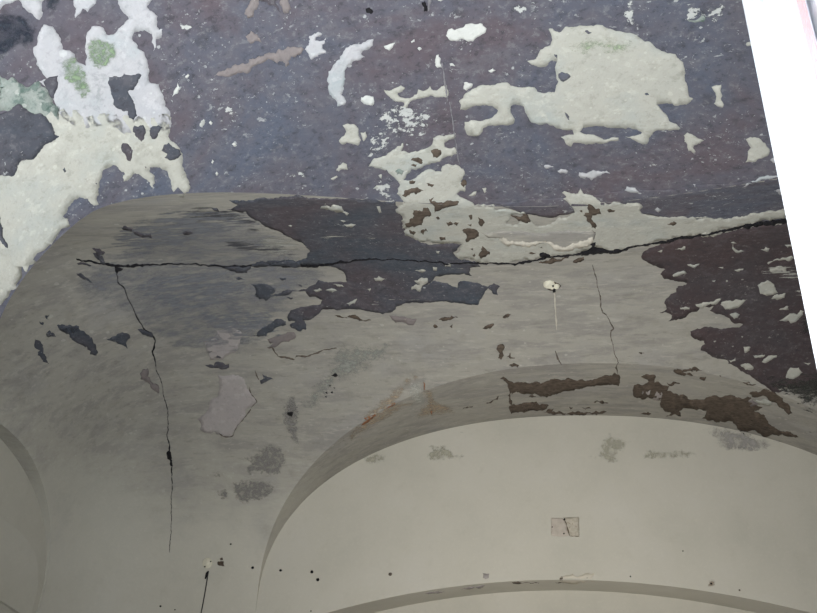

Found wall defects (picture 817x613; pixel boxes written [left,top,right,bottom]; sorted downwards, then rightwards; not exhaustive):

peeling [215,31,326,77]
peeling [327,39,373,106]
peeling [0,0,190,305]
peeling [339,1,786,292]
peeling [320,205,355,228]
peeling [256,308,336,360]
crack [76,218,787,552]
peeling [487,381,607,416]
peeling [680,298,747,319]
peeling [730,346,777,370]
peeling [758,244,804,323]
peeling [786,363,810,379]